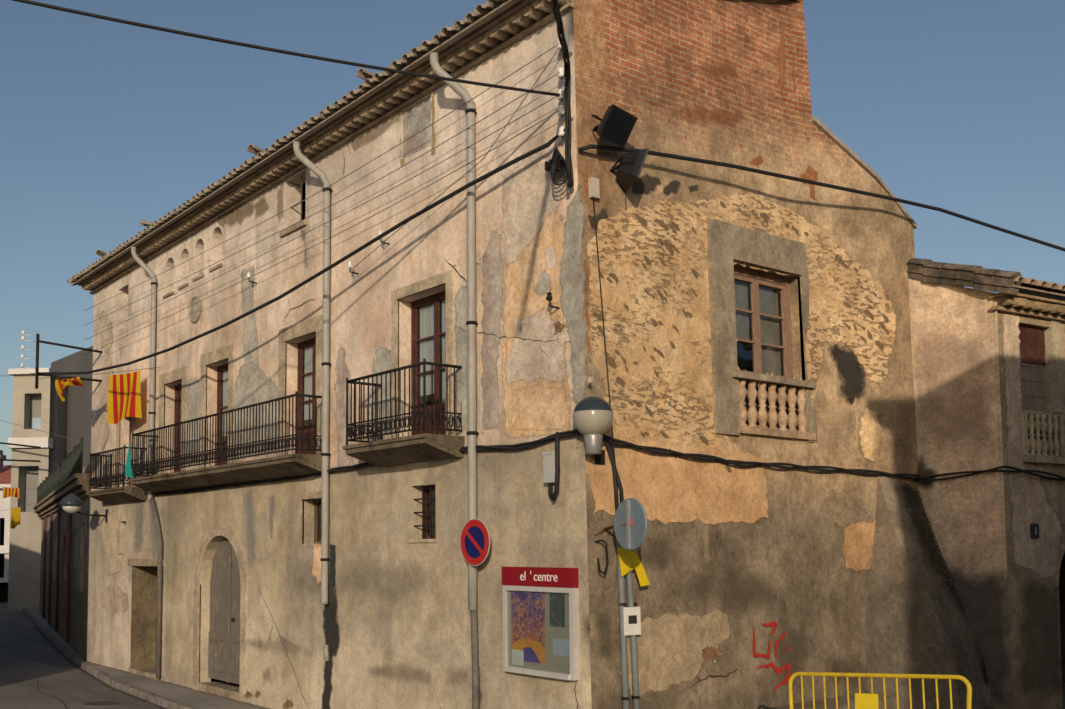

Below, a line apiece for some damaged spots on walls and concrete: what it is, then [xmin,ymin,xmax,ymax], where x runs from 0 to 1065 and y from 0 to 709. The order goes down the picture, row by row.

crack [454,326,571,357]
peeling [454,155,896,525]
damp [831,344,865,404]
peeling [835,519,876,571]
peeling [618,607,733,698]
crack [691,669,738,688]